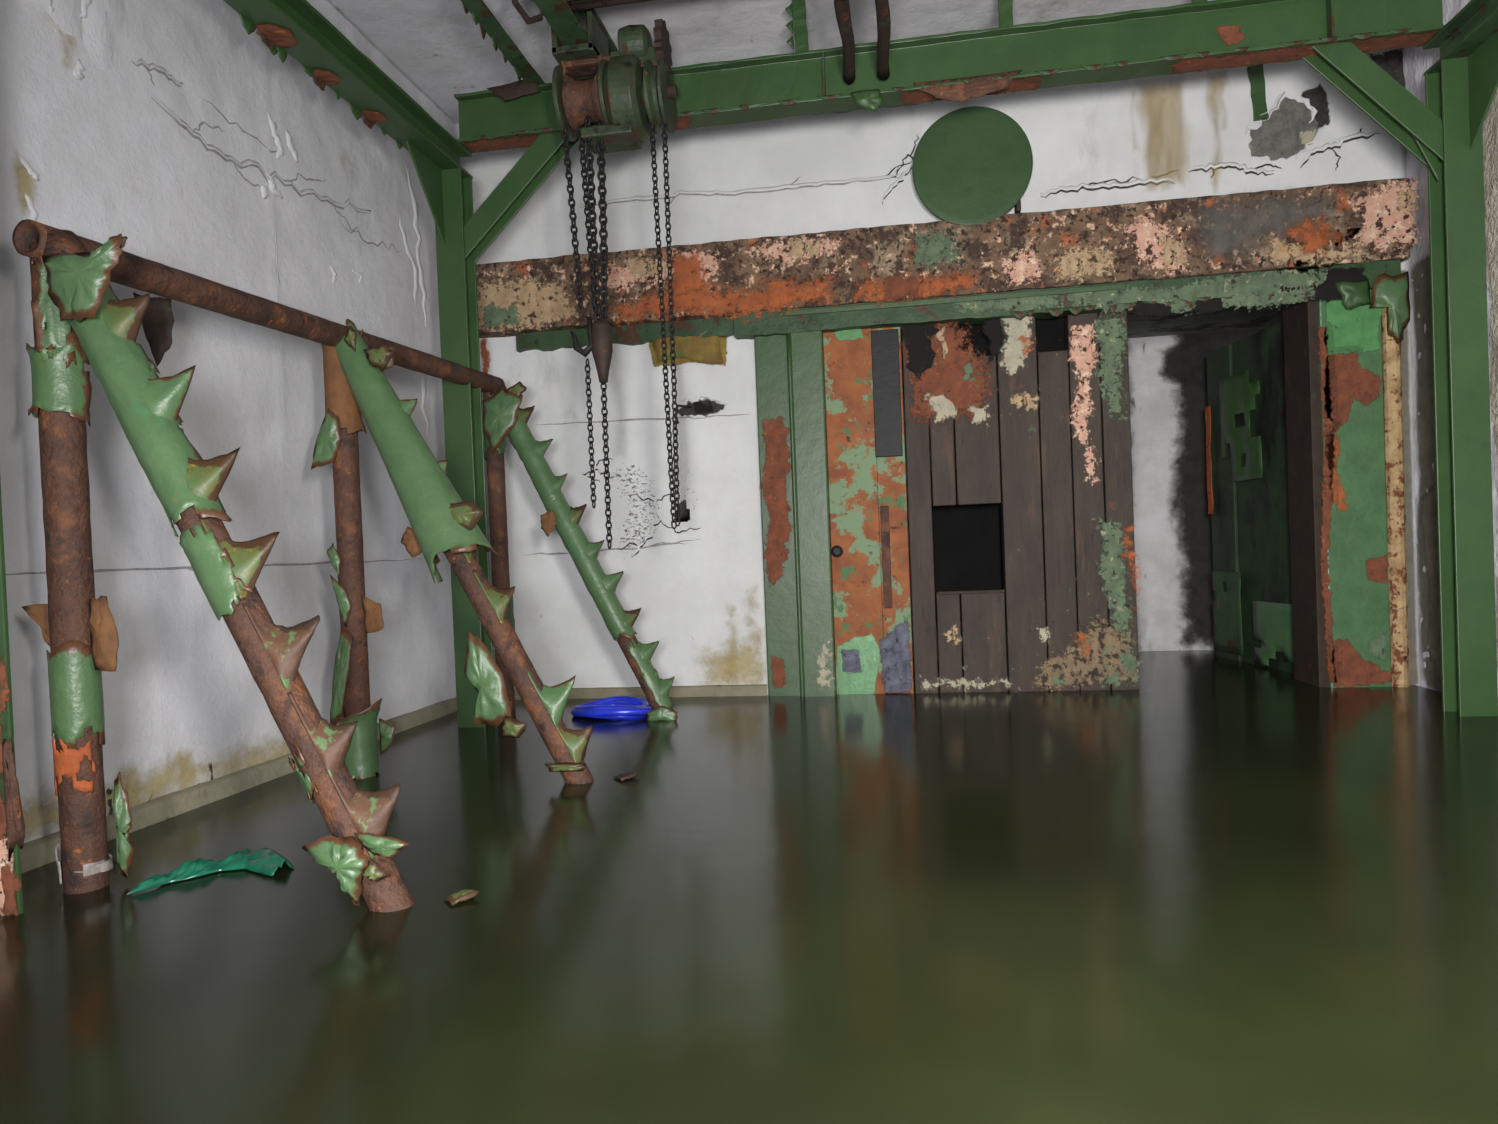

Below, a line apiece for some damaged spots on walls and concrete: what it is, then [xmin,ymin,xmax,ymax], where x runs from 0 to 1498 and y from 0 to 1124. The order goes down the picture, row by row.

crack [131,57,401,303]
rust [612,251,977,367]
spalling [1245,84,1330,161]
rust [1283,214,1342,255]
peeling [1482,88,1498,454]
rust [759,416,793,587]
leakage [711,639,756,681]
rust [771,656,787,688]